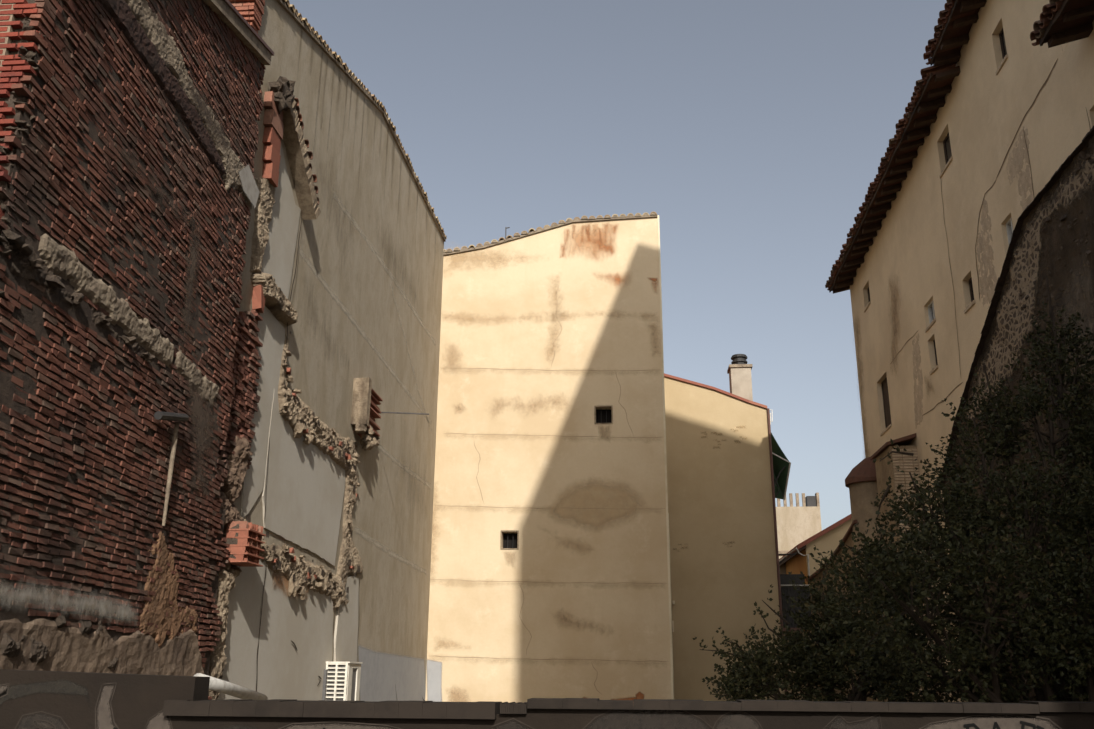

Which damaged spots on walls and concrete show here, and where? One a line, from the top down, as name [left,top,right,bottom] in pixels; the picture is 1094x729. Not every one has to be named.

spalling [292,94,319,205]
rust [562,225,615,256]
crack [923,59,1058,415]
crack [451,286,658,438]
spalling [213,436,252,525]
spalling [259,333,380,610]
crack [435,433,540,509]
peeling [0,585,134,619]